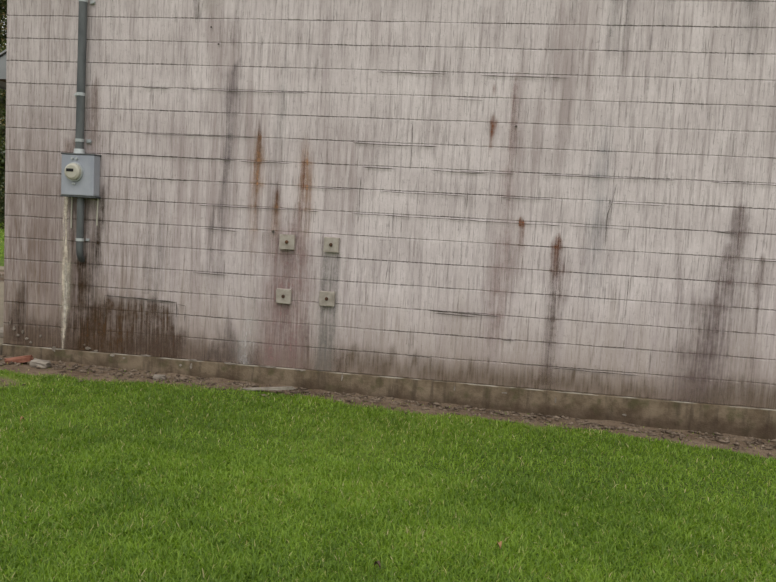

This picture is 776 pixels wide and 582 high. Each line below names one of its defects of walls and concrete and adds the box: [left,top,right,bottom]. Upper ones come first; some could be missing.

corrosion [254,131,262,192]
leakage [9,197,196,358]
leakage [680,206,744,391]